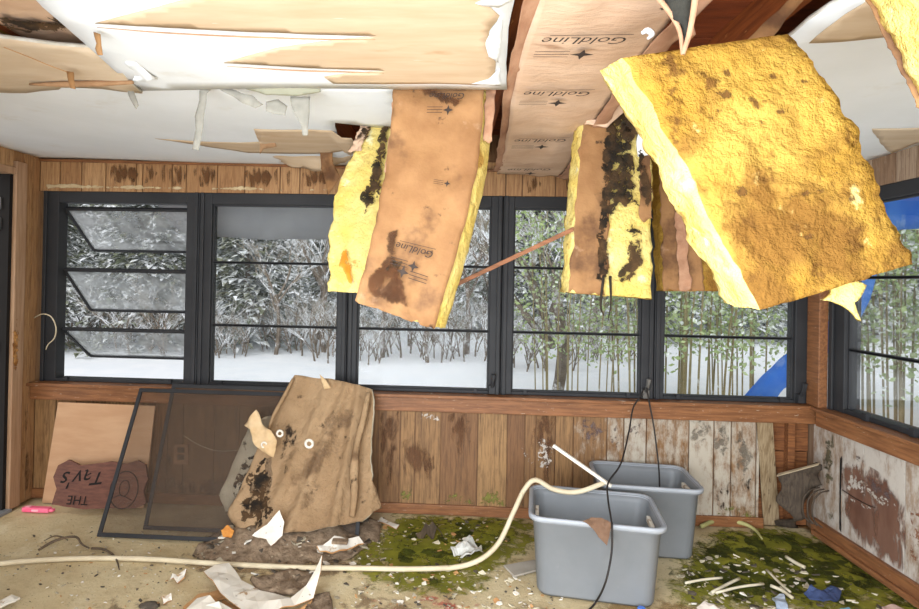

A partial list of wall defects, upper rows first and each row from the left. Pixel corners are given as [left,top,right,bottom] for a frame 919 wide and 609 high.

water stain [0,17,66,33]
water stain [46,165,290,191]
water stain [301,171,326,191]
water stain [380,412,435,481]
water stain [534,416,553,480]